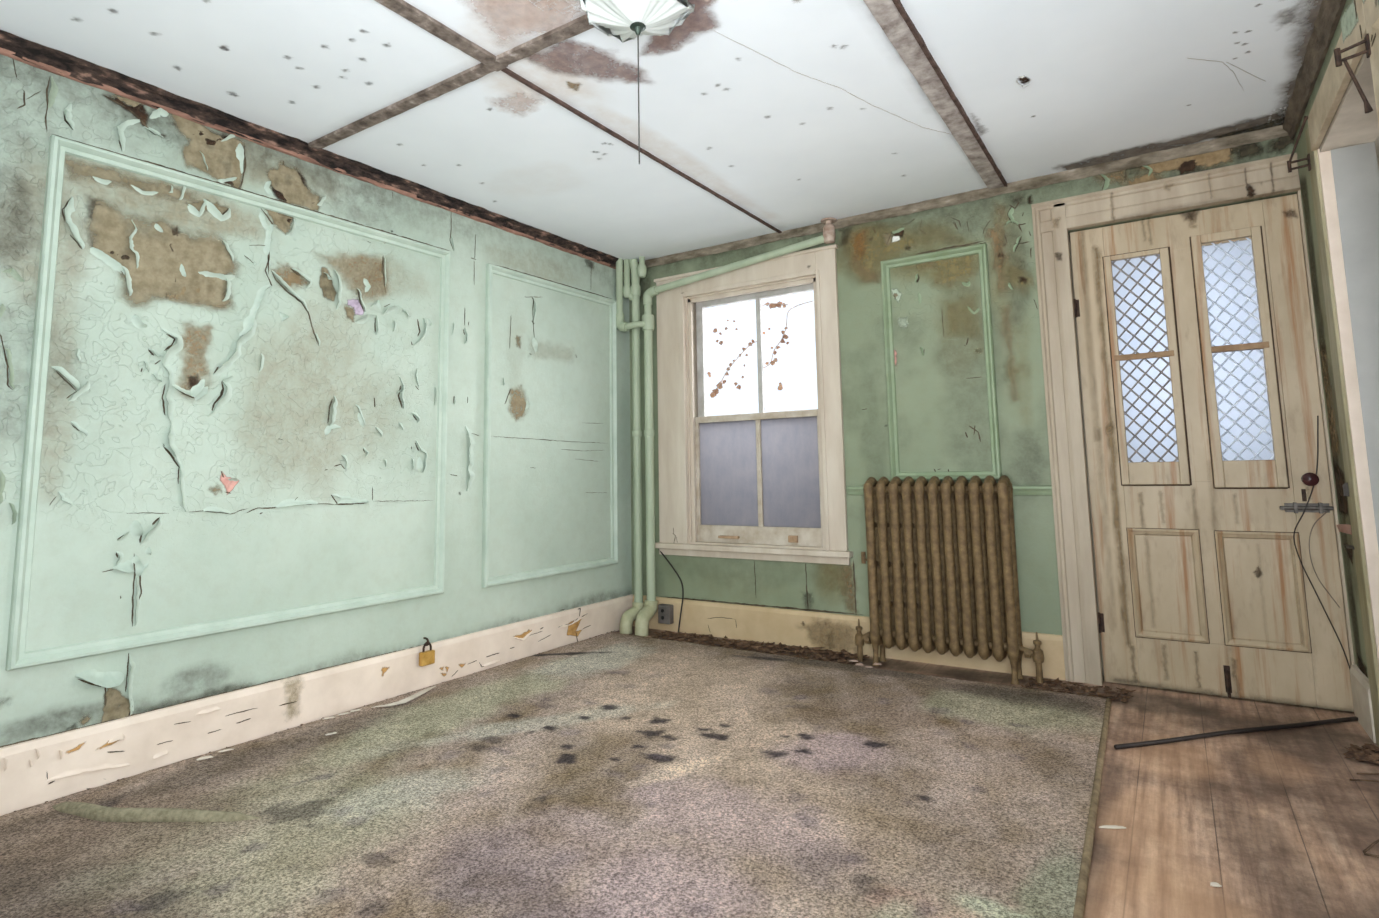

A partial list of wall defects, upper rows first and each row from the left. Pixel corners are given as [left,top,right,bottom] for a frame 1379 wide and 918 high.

damp [474,0,716,91]
damp [1061,0,1323,190]
spalling [104,95,246,188]
spalling [259,161,326,237]
peeling [52,348,90,401]
spalling [62,156,257,512]
peeling [275,241,432,347]
spalling [503,378,530,419]
damp [843,229,986,286]
peeling [0,470,17,524]
peeling [440,608,591,676]
peeling [29,653,136,784]